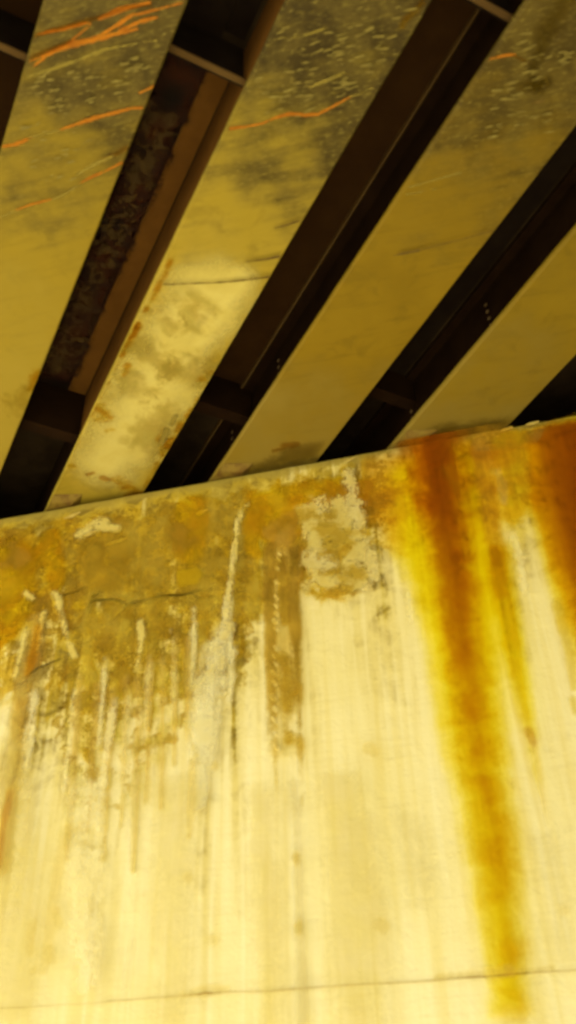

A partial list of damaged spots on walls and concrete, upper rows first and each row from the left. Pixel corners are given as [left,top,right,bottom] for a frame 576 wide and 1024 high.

corrosion [1,54,206,383]
leakage [190,505,246,693]
leakage [271,552,282,632]
peeling [296,456,380,592]
leakage [98,705,127,741]